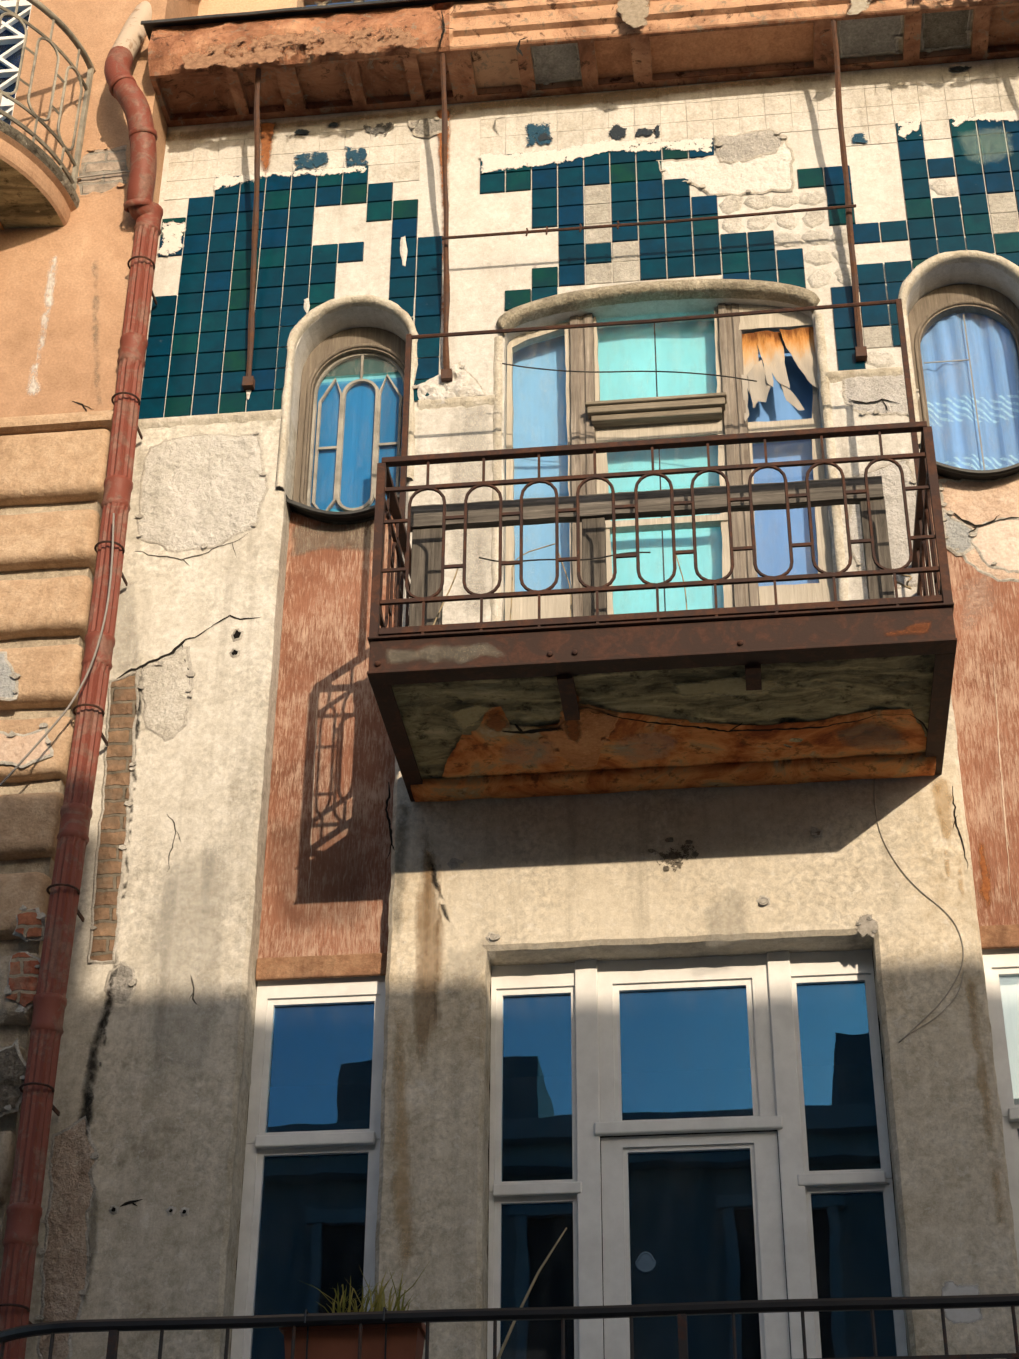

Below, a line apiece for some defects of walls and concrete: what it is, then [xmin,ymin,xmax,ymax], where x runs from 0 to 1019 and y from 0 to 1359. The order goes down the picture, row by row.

peeling [617,0,649,28]
peeling [182,25,417,70]
peeling [213,146,368,190]
peeling [479,123,795,197]
peeling [851,133,868,144]
peeling [898,120,921,139]
peeling [952,110,1019,127]
peeling [157,221,186,256]
peeling [938,472,1019,625]
crack [117,615,260,685]
flaking render [87,646,195,965]
corrosion [979,843,991,904]